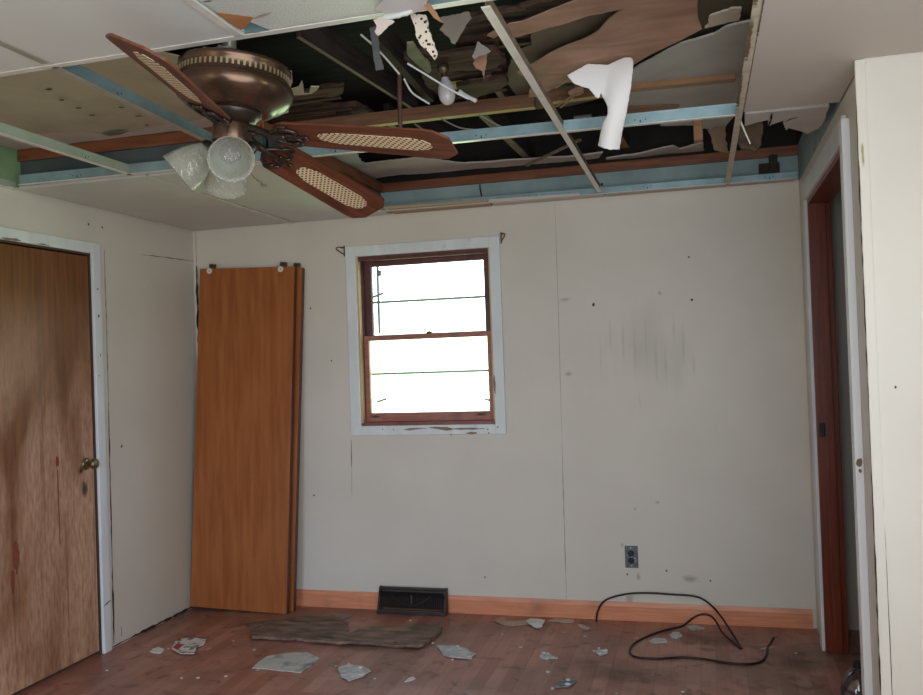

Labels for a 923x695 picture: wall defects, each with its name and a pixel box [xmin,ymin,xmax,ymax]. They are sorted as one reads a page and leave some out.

spalling [215,12,271,33]
peeling [80,57,205,121]
peeling [290,70,319,95]
peeling [0,69,166,136]
peeling [382,426,498,435]